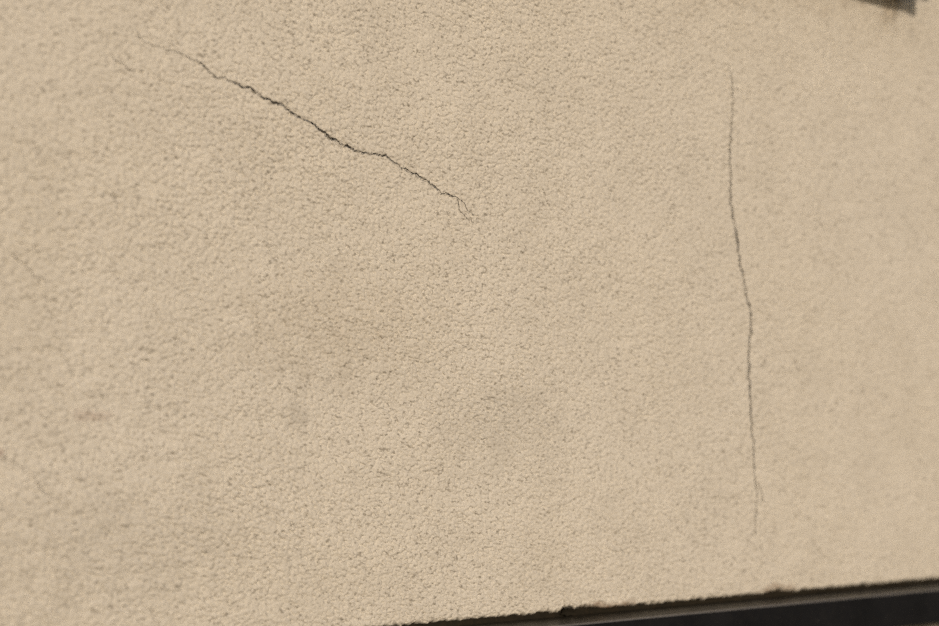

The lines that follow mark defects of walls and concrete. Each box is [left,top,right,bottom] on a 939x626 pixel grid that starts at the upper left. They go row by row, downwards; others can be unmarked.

crack [139,36,474,223]
crack [729,74,764,533]